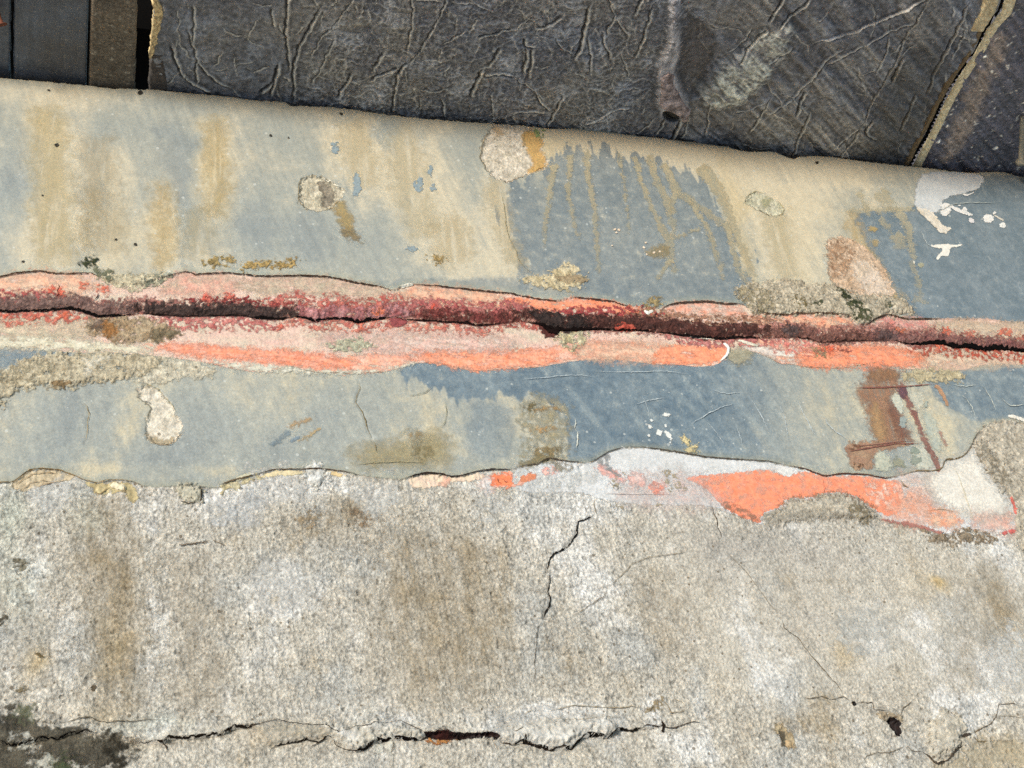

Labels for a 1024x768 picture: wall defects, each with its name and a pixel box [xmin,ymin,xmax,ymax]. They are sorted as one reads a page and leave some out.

flaking render [480,123,550,183]
water stain [333,201,360,241]
water stain [617,153,741,273]
peeling [914,171,1006,260]
crack [0,270,1024,368]
flaking render [136,384,183,445]
corrosion [844,367,949,472]
peeling [408,413,1018,548]
crack [534,499,596,678]
water stain [0,699,140,768]
crack [1,716,428,751]
crack [504,705,696,751]